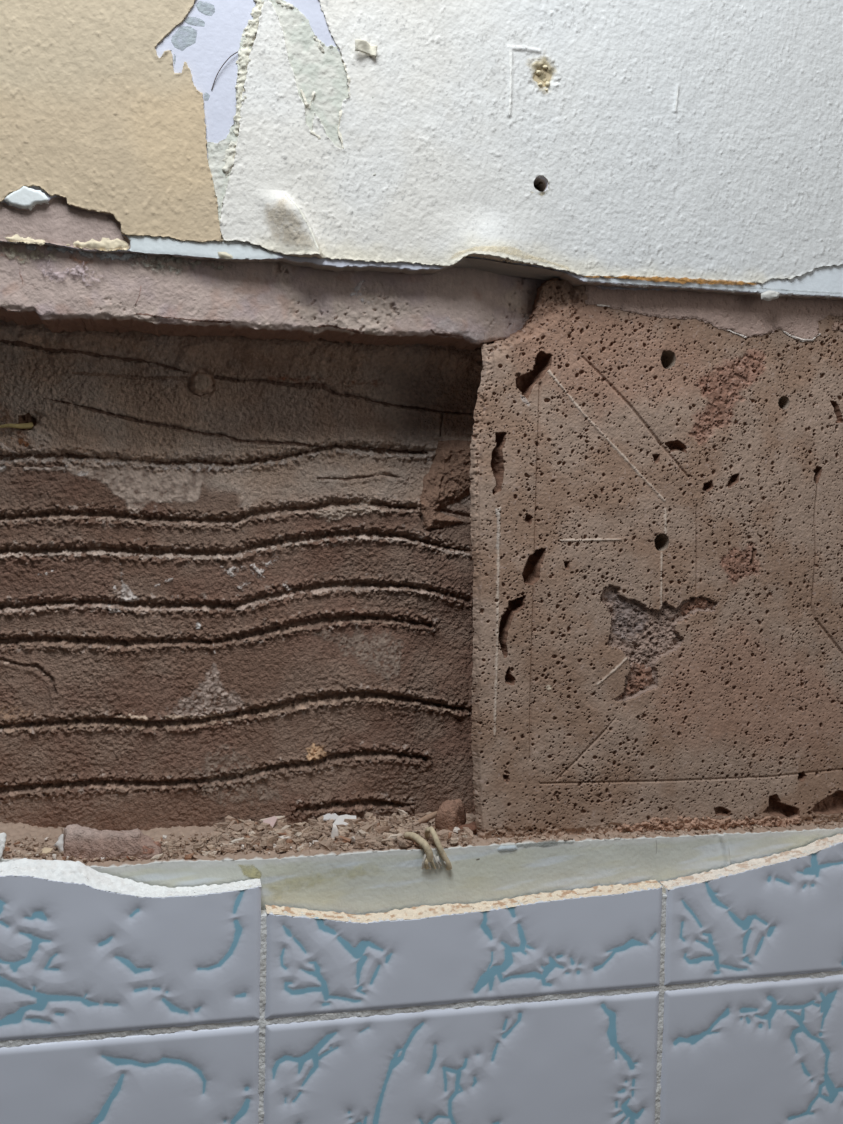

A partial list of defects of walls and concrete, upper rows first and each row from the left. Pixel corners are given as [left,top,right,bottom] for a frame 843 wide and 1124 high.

peeling [275,0,340,54]
peeling [155,0,256,178]
peeling [584,265,843,301]
spalling [18,413,36,431]
spalling [600,585,718,701]
spalling [615,810,801,832]
spalling [0,847,261,897]
spalling [265,834,843,923]